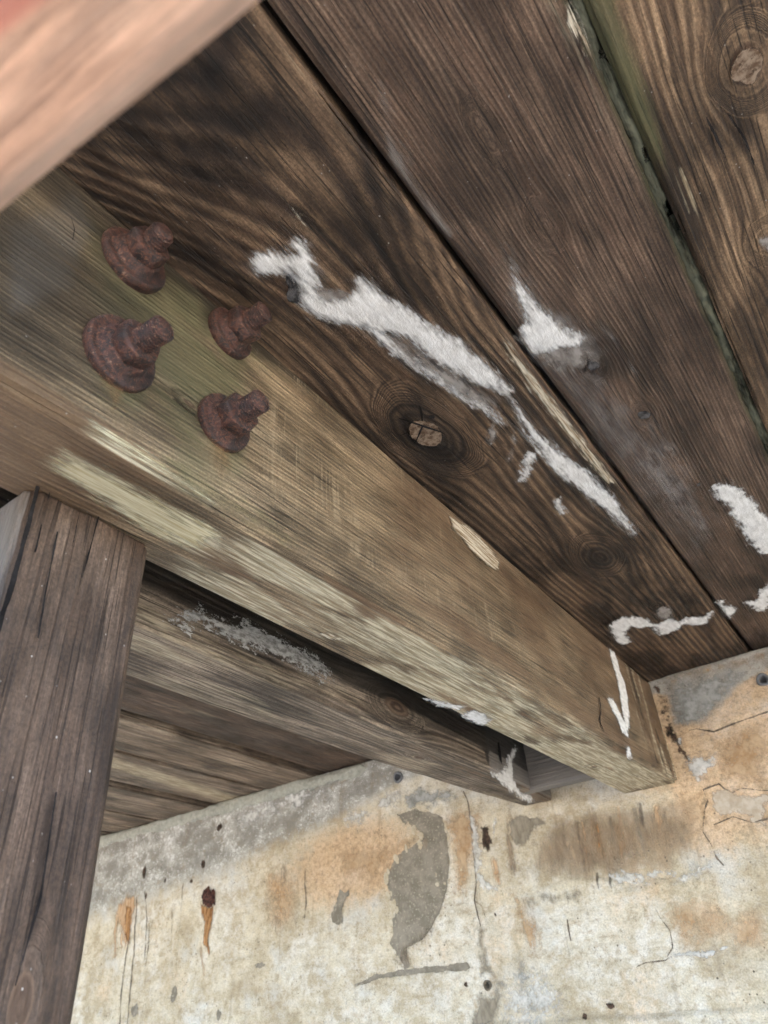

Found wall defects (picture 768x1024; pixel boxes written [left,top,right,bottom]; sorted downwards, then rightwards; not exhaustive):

damp [251,242,511,444]
damp [516,279,592,371]
damp [516,407,635,533]
damp [712,483,768,554]
damp [608,585,768,759]
crack [692,711,768,733]
damp [491,747,532,803]
crack [703,783,768,866]
corrosion [114,897,135,956]
corrosion [200,886,215,964]
peeling [354,809,470,987]